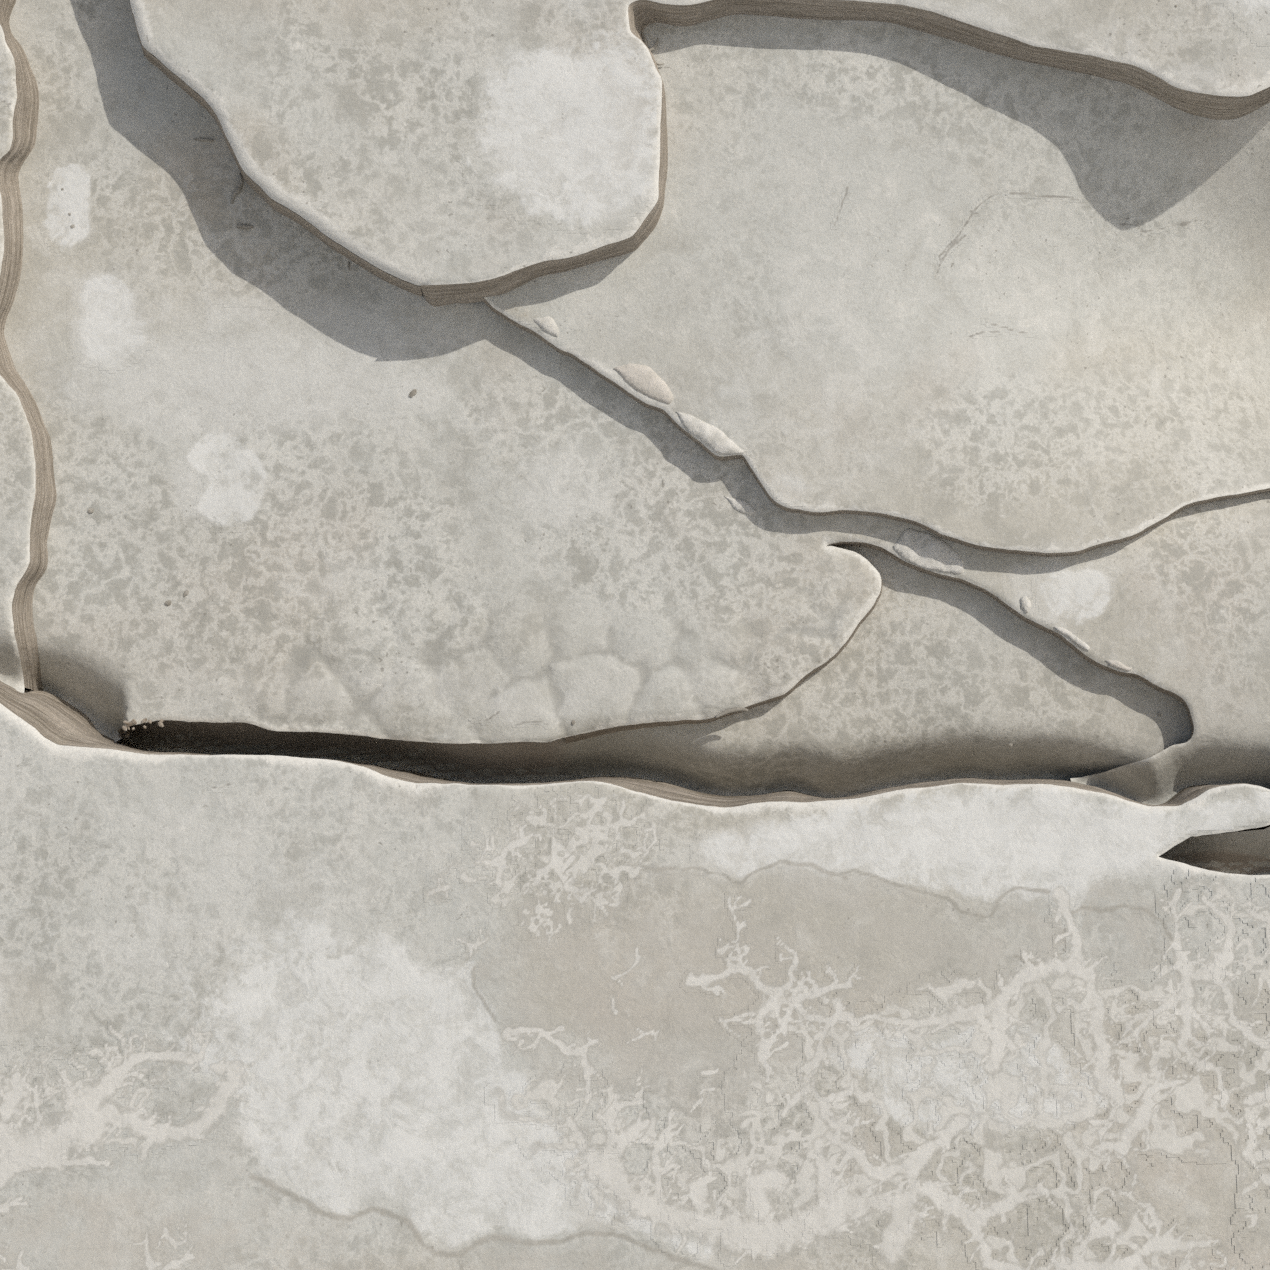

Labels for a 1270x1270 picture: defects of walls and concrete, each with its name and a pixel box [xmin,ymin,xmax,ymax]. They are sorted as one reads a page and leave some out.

flaking render [0,0,1270,805]
crack [0,0,1270,808]
crack [1158,825,1270,874]
flaking render [1159,827,1270,875]